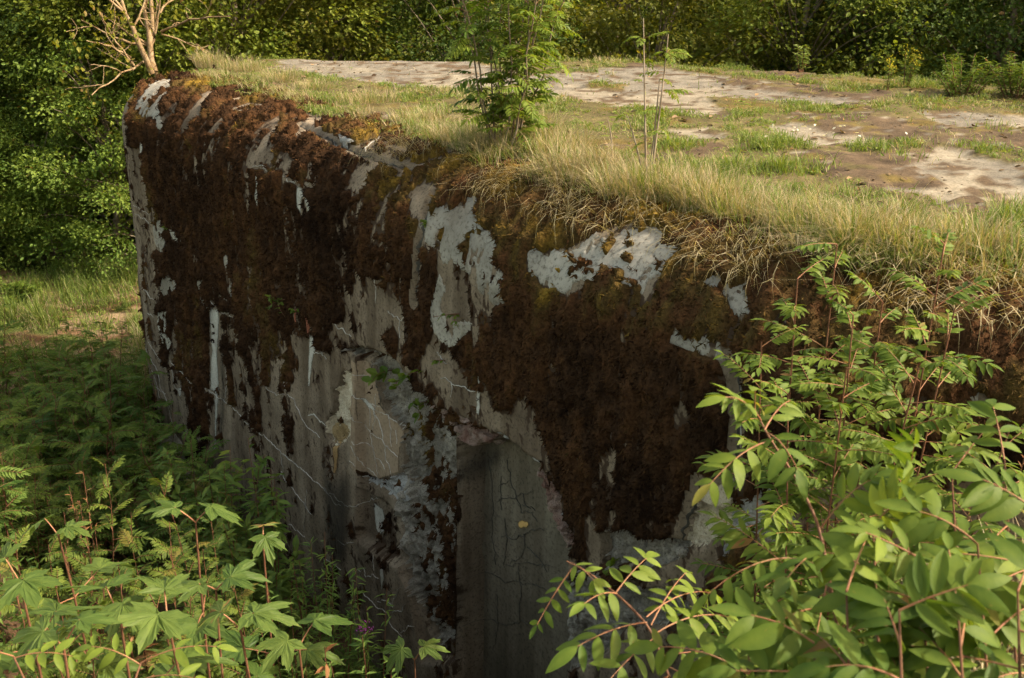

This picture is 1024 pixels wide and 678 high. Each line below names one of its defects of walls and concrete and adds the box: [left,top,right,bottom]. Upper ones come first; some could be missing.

crack [145,342,406,537]
spalling [326,370,353,446]
crack [326,542,414,637]
spalling [342,347,509,645]
crack [464,460,550,647]